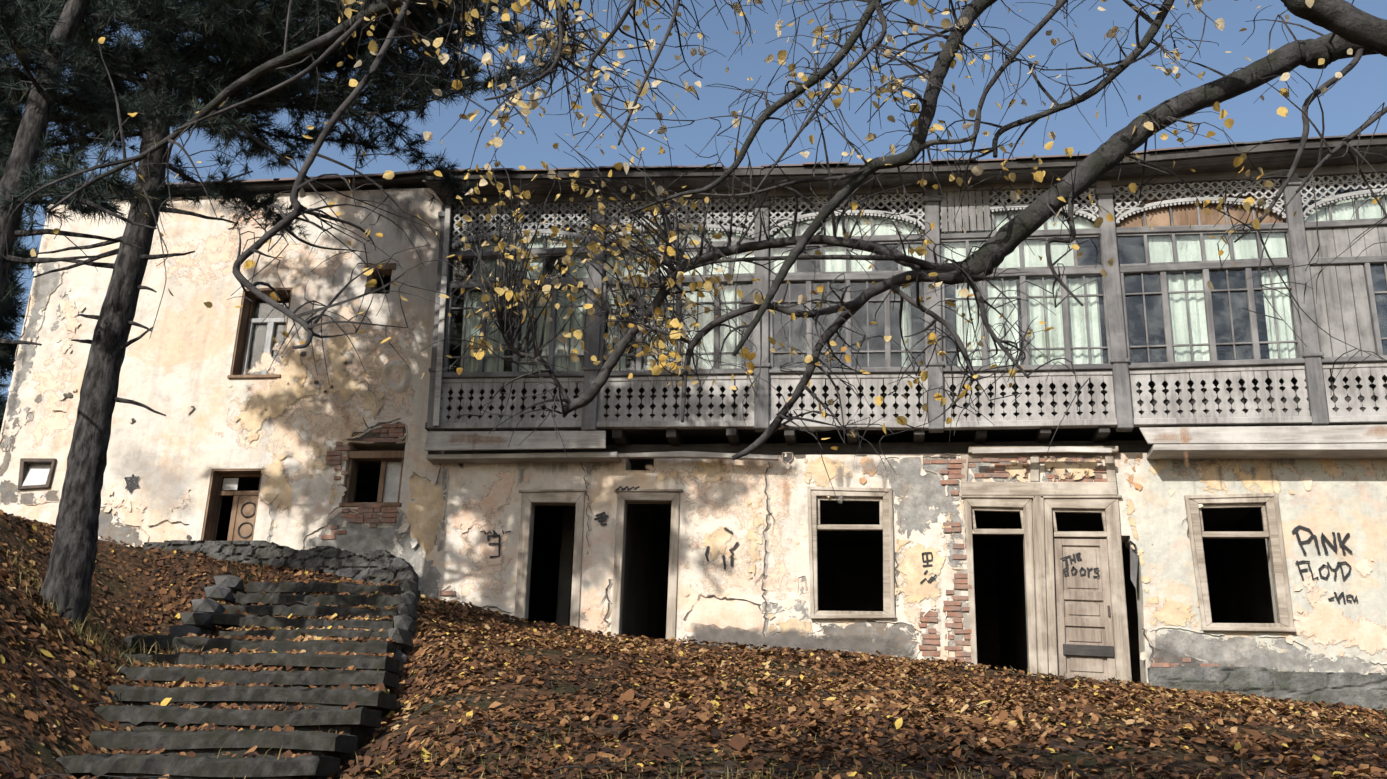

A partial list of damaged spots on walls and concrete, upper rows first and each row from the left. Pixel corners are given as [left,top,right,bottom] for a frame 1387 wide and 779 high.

spalling [0,262,85,506]
peeling [215,298,530,605]
crack [683,461,775,638]
spalling [646,452,1108,663]
spalling [1124,455,1387,675]